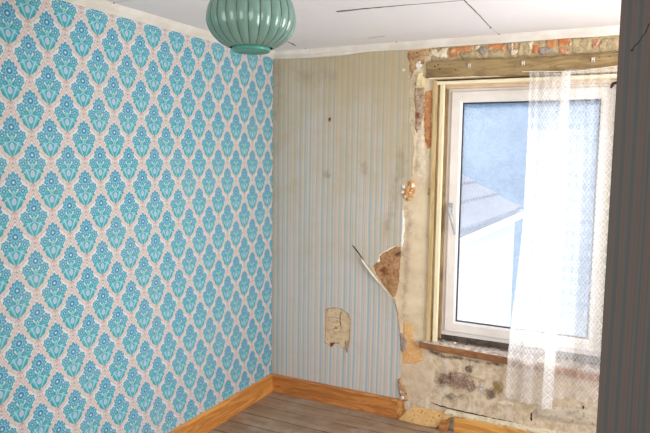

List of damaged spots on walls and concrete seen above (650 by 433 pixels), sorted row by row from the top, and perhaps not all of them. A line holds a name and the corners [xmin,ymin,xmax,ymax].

flaking render [400,35,619,202]
flaking render [373,246,401,297]
spalling [324,307,351,352]
flaking render [398,322,436,402]
damp [431,350,478,399]